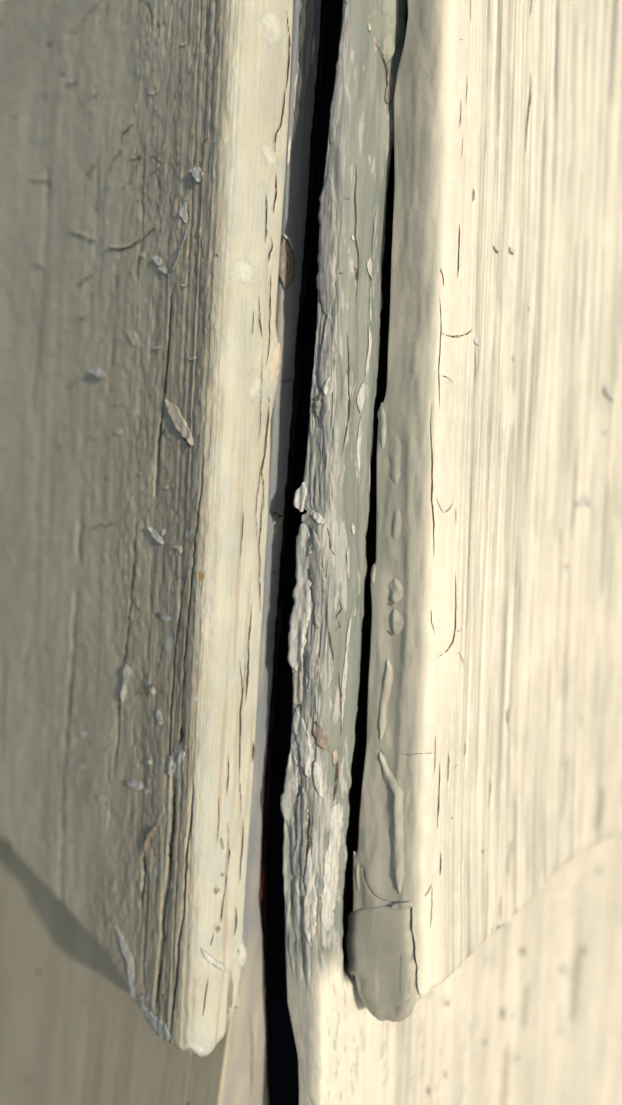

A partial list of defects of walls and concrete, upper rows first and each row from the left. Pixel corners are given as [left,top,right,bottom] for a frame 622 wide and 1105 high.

crack [337,165,359,297]
peeling [164,399,193,448]
crack [342,335,351,455]
crack [430,224,477,562]
peeling [147,527,183,553]
crack [108,18,319,1014]
peeling [280,482,345,946]
peeling [340,611,352,735]
crack [431,589,463,663]
crack [306,760,339,858]
peeling [115,924,171,1040]
peeling [346,901,423,1012]